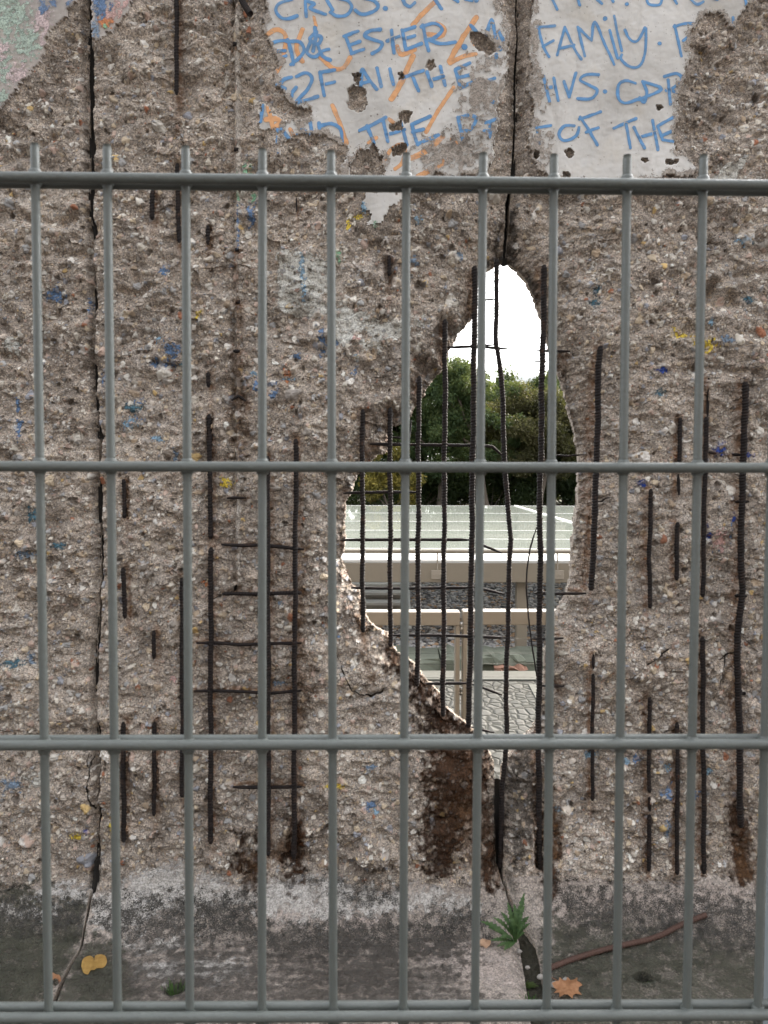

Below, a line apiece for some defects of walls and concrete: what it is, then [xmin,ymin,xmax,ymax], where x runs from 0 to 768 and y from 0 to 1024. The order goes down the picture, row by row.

crack [88,0,98,240]
spalling [0,0,586,178]
crack [501,0,519,267]
spalling [639,0,768,180]
spalling [0,189,768,735]
crack [96,480,104,692]
corrosion [365,639,473,734]
crack [83,725,102,942]
leakage [0,853,521,1001]
corrosion [271,817,309,899]
spalling [0,749,768,893]
corrosion [409,750,505,894]